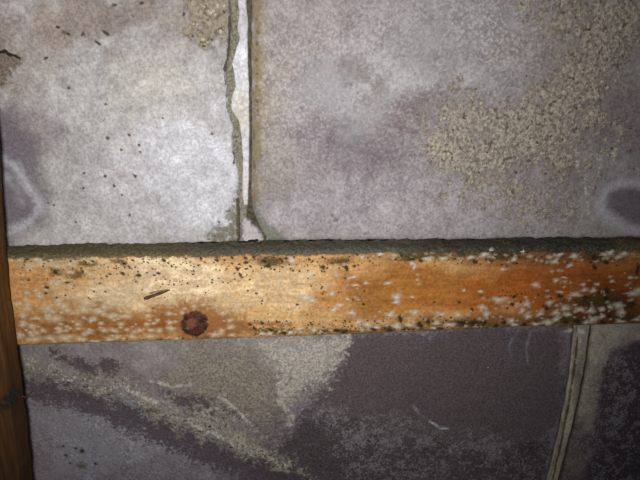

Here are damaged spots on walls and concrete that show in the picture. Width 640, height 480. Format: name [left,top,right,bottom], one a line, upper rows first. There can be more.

corrosion [130,301,257,339]
leakage [15,248,640,480]